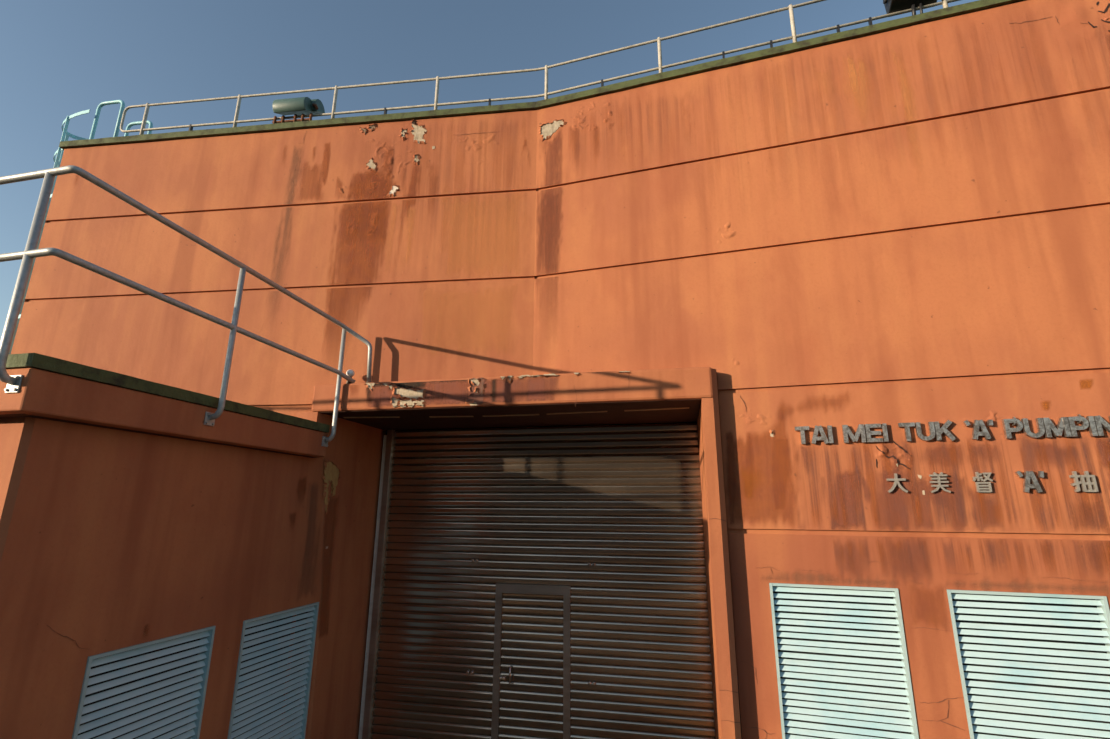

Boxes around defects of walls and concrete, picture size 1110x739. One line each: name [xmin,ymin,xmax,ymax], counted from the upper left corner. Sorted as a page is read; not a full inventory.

peeling [399,120,435,165]
peeling [538,119,567,141]
peeling [366,157,378,172]
water stain [540,134,561,259]
peeling [366,383,427,407]
peeling [465,377,487,406]
peeling [500,374,559,383]
water stain [811,444,995,529]
water stain [1023,439,1110,525]